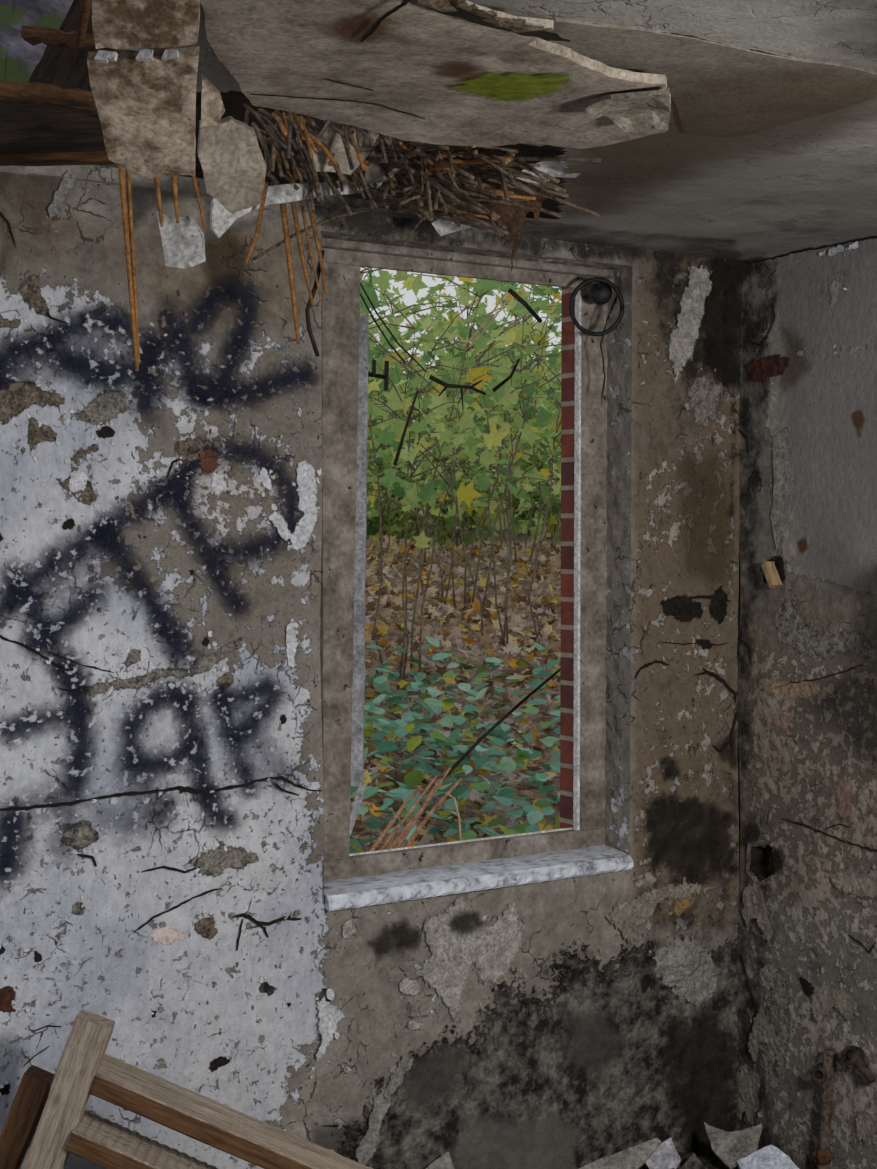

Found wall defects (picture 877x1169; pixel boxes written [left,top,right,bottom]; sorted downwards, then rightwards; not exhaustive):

peeling [549,18,877,138]
peeling [664,265,729,438]
water stain [698,260,744,412]
spalling [0,378,132,508]
peeling [255,460,322,551]
crack [635,595,751,762]
crack [0,776,321,813]
water stain [646,798,738,885]
crack [229,909,301,951]
water stain [451,912,482,933]
spalling [331,840,860,1169]
water stain [663,1010,739,1152]